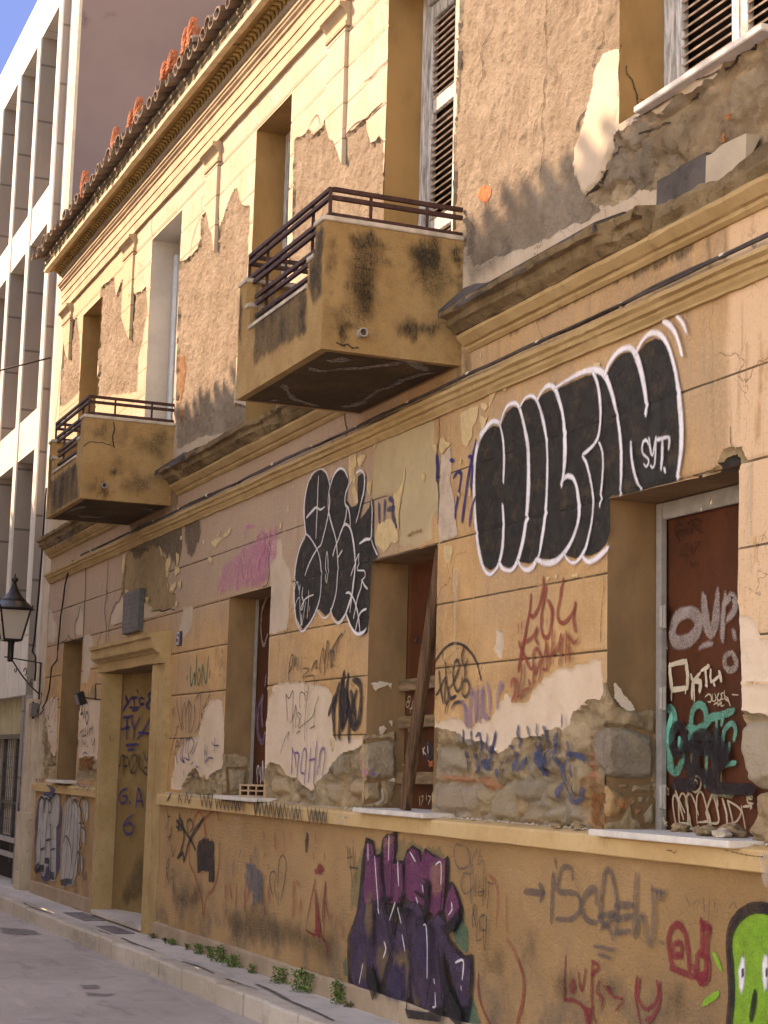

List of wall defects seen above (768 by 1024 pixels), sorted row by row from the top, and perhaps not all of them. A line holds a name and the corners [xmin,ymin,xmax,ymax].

flaking render [288,120,385,268]
flaking render [452,0,768,266]
crack [585,44,757,198]
flaking render [97,277,148,396]
flaking render [176,187,250,449]
damp [253,232,322,362]
damp [339,231,382,338]
damp [413,238,440,290]
damp [48,459,100,518]
peeling [171,698,250,796]
peeling [265,681,398,808]
flaking render [432,658,656,830]